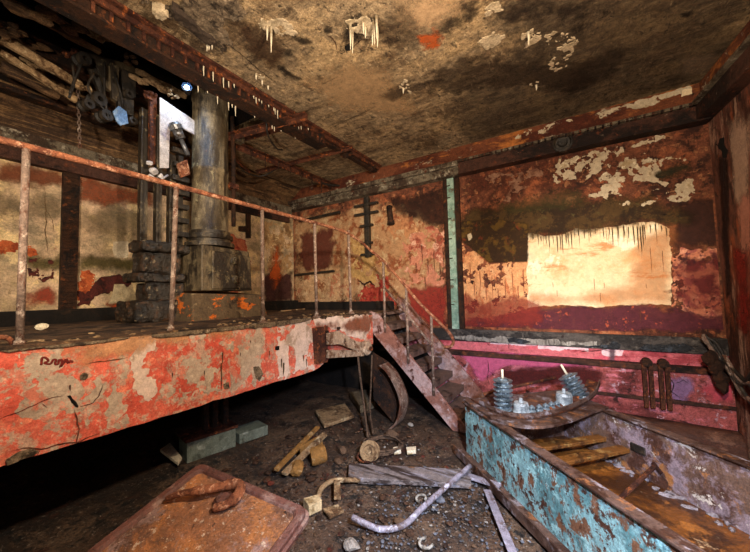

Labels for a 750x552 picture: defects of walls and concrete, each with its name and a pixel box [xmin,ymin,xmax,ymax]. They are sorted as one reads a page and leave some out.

leakage [234,18,312,88]
leakage [345,14,379,53]
corrosion [419,34,440,48]
peeling [599,86,692,119]
peeling [553,135,695,206]
leakage [461,196,692,263]
peeling [1,314,371,429]
crack [5,386,103,455]
spalling [5,449,39,466]